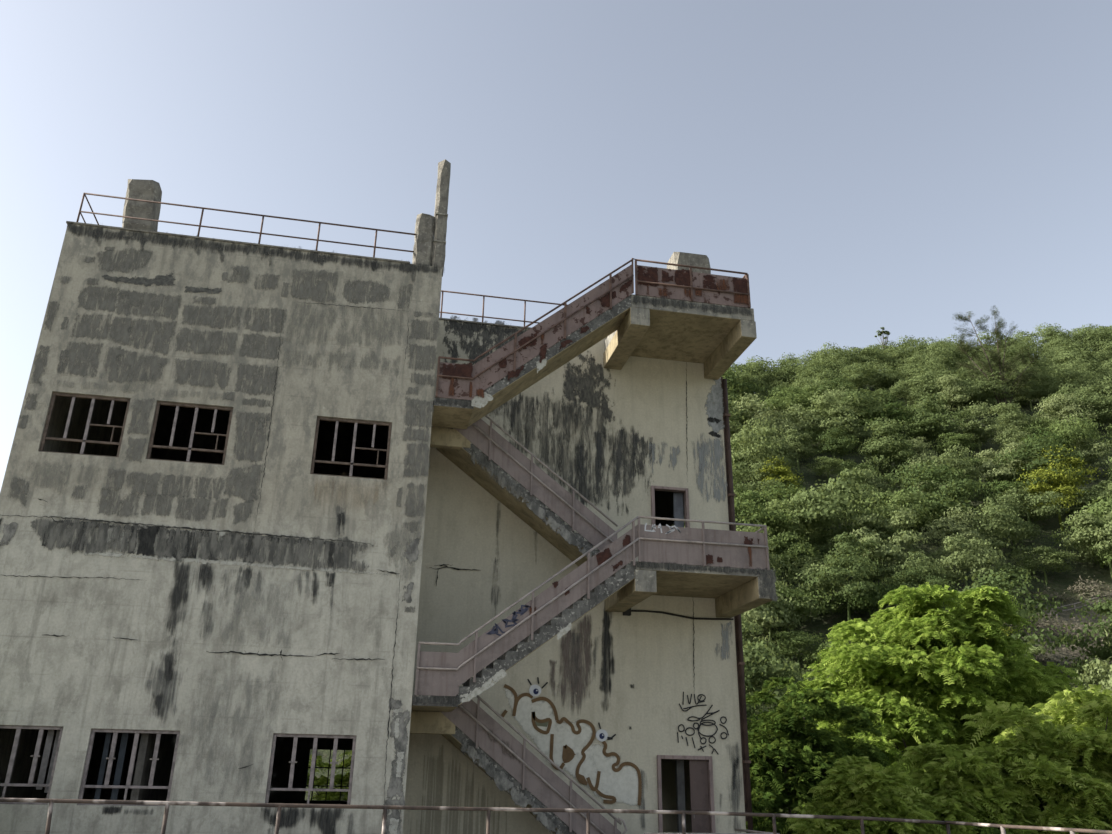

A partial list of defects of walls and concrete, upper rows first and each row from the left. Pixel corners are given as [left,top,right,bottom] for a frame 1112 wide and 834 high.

water stain [67,223,438,281]
rust [518,266,749,363]
crack [2,302,409,544]
rust [442,362,484,398]
rust [499,358,525,381]
water stain [490,351,727,512]
crack [4,573,139,581]
crack [429,564,476,585]
rust [596,535,631,571]
water stain [147,561,260,717]
crack [206,570,400,804]
water stain [550,611,614,710]